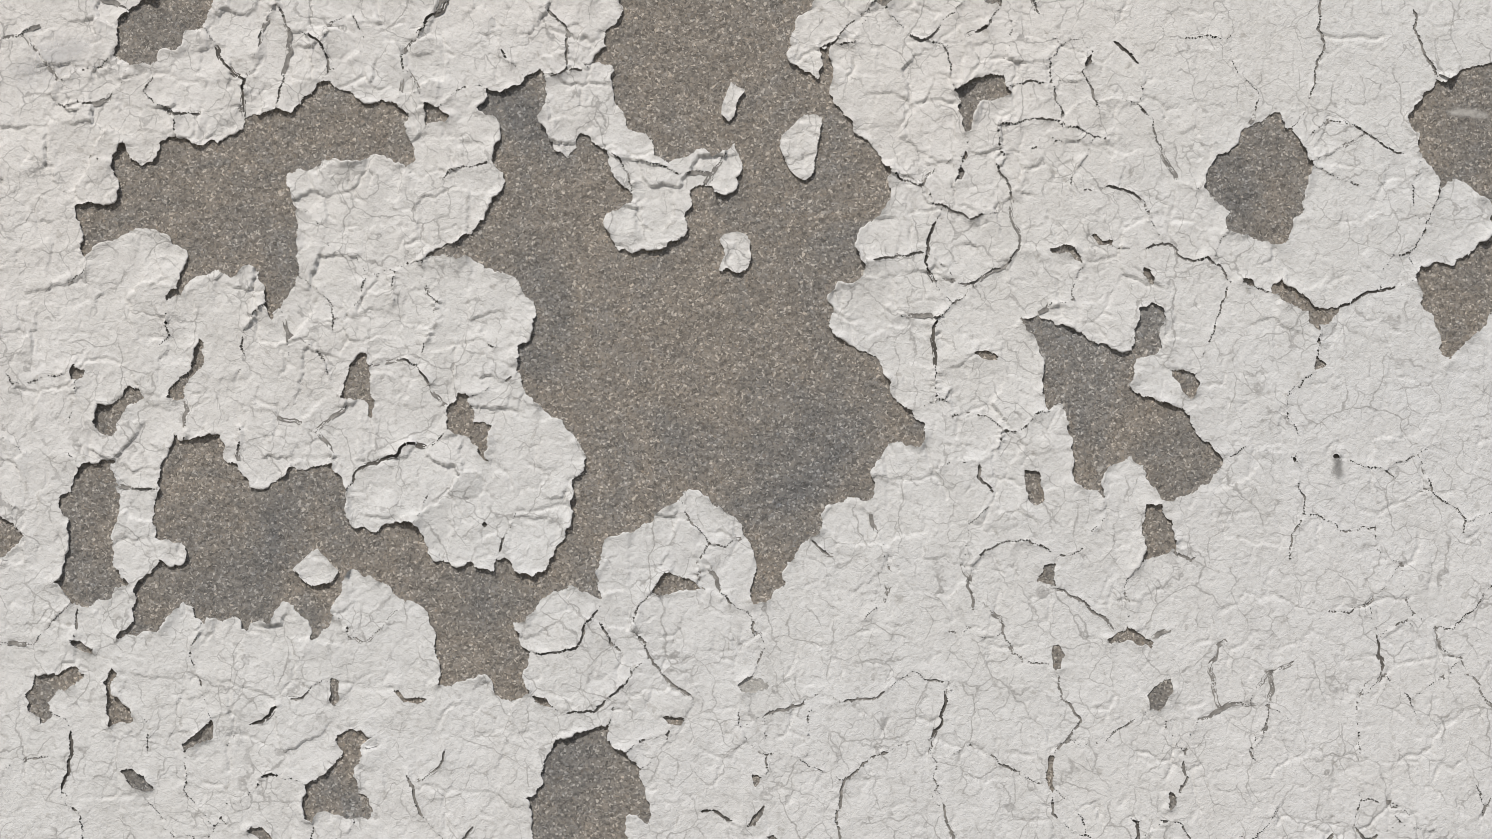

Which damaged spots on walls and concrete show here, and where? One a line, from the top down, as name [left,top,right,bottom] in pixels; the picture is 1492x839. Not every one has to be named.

crack [3,24,201,130]
crack [214,5,364,116]
crack [239,211,518,486]
peeling [45,0,925,708]
crack [738,0,1294,839]
peeling [1020,267,1223,571]
peeling [1197,112,1317,245]
crack [1294,0,1431,307]
peeling [1401,55,1492,359]
crack [1287,341,1492,839]
peeling [292,723,381,823]
peeling [518,720,651,839]